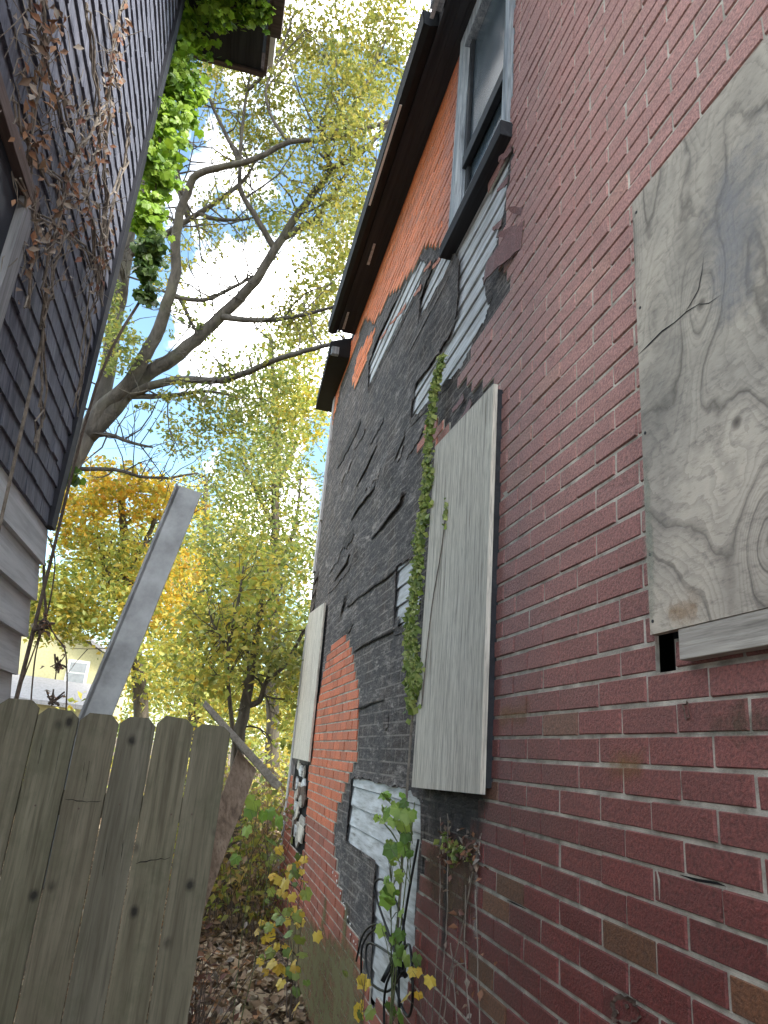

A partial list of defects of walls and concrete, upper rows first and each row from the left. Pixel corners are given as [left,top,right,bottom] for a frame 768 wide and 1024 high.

peeling [368,254,459,393]
peeling [482,277,493,305]
peeling [337,417,383,486]
peeling [365,369,460,491]
spalling [291,759,310,854]
peeling [345,771,425,942]
crack [656,868,725,913]